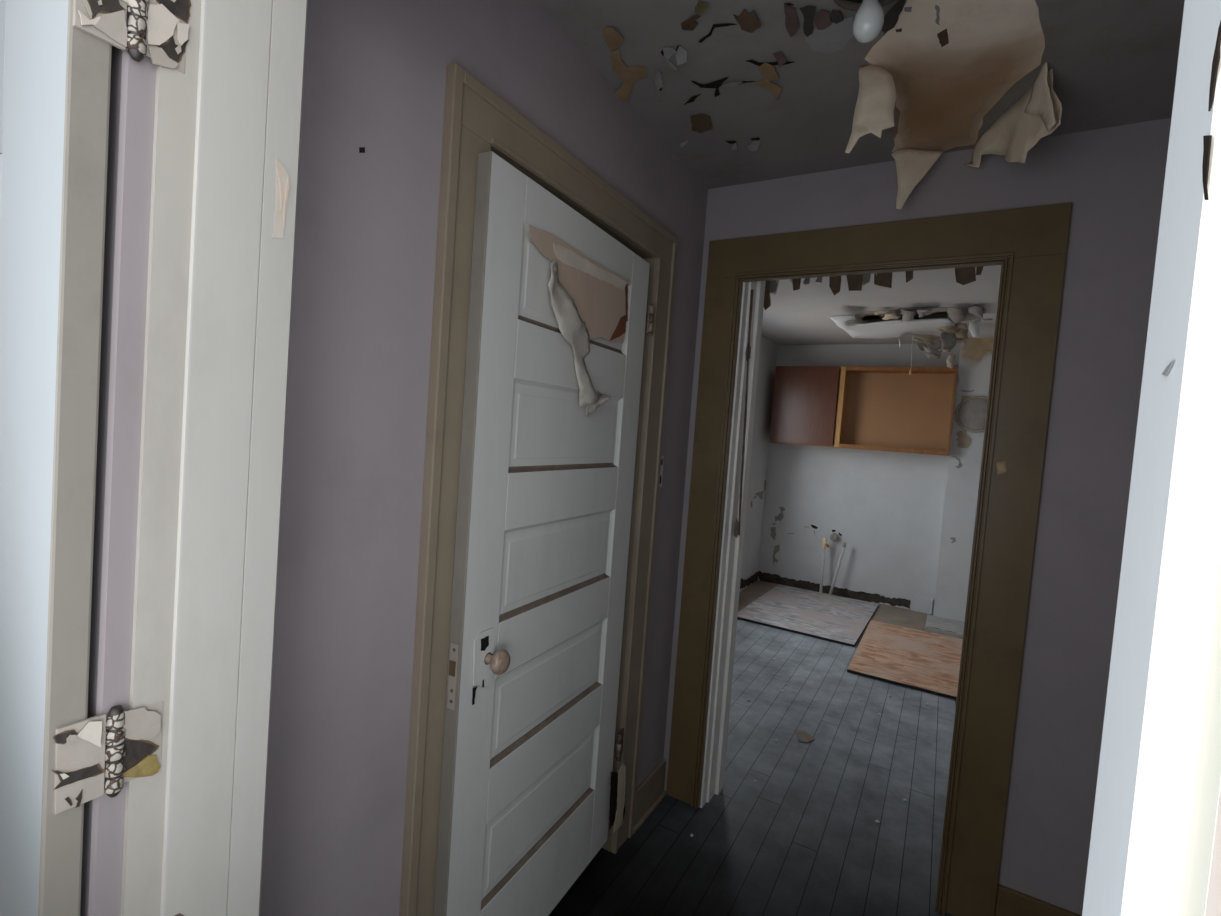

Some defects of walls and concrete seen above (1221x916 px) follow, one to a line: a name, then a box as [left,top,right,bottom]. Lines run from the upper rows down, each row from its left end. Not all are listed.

peeling [602,1,761,103]
peeling [784,3,854,54]
peeling [882,0,905,33]
peeling [680,51,793,148]
crack [1202,21,1221,200]
peeling [764,271,913,310]
peeling [955,266,984,285]
flaking render [909,323,973,448]
crack [1162,360,1175,376]